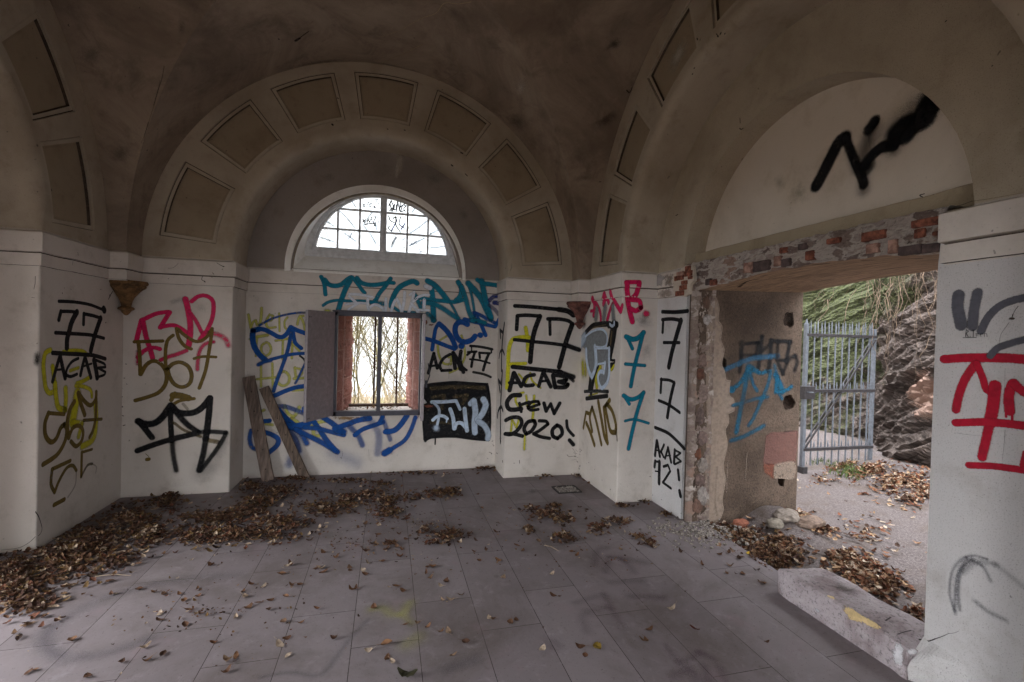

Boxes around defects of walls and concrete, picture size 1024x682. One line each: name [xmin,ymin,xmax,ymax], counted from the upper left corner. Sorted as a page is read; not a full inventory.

spalling [657,265,735,524]
spalling [763,430,798,486]